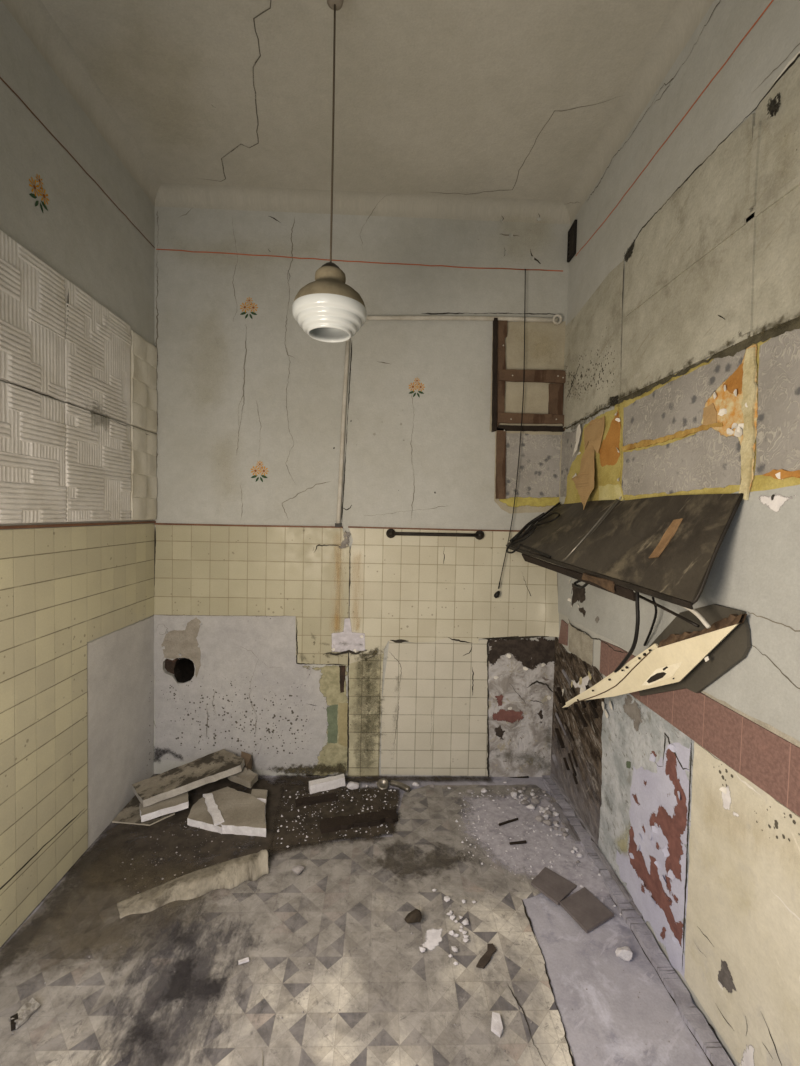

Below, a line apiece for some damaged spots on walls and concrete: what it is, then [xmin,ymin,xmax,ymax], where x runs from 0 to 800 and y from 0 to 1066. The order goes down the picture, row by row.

crack [199,0,271,182]
crack [431,96,620,195]
crack [570,2,720,203]
water stain [767,92,781,117]
crack [232,219,262,449]
crack [268,216,331,518]
peeling [564,407,624,510]
peeling [701,344,796,512]
spalling [161,617,202,683]
spalling [488,637,555,679]
water stain [0,649,491,970]
peeling [628,744,688,947]